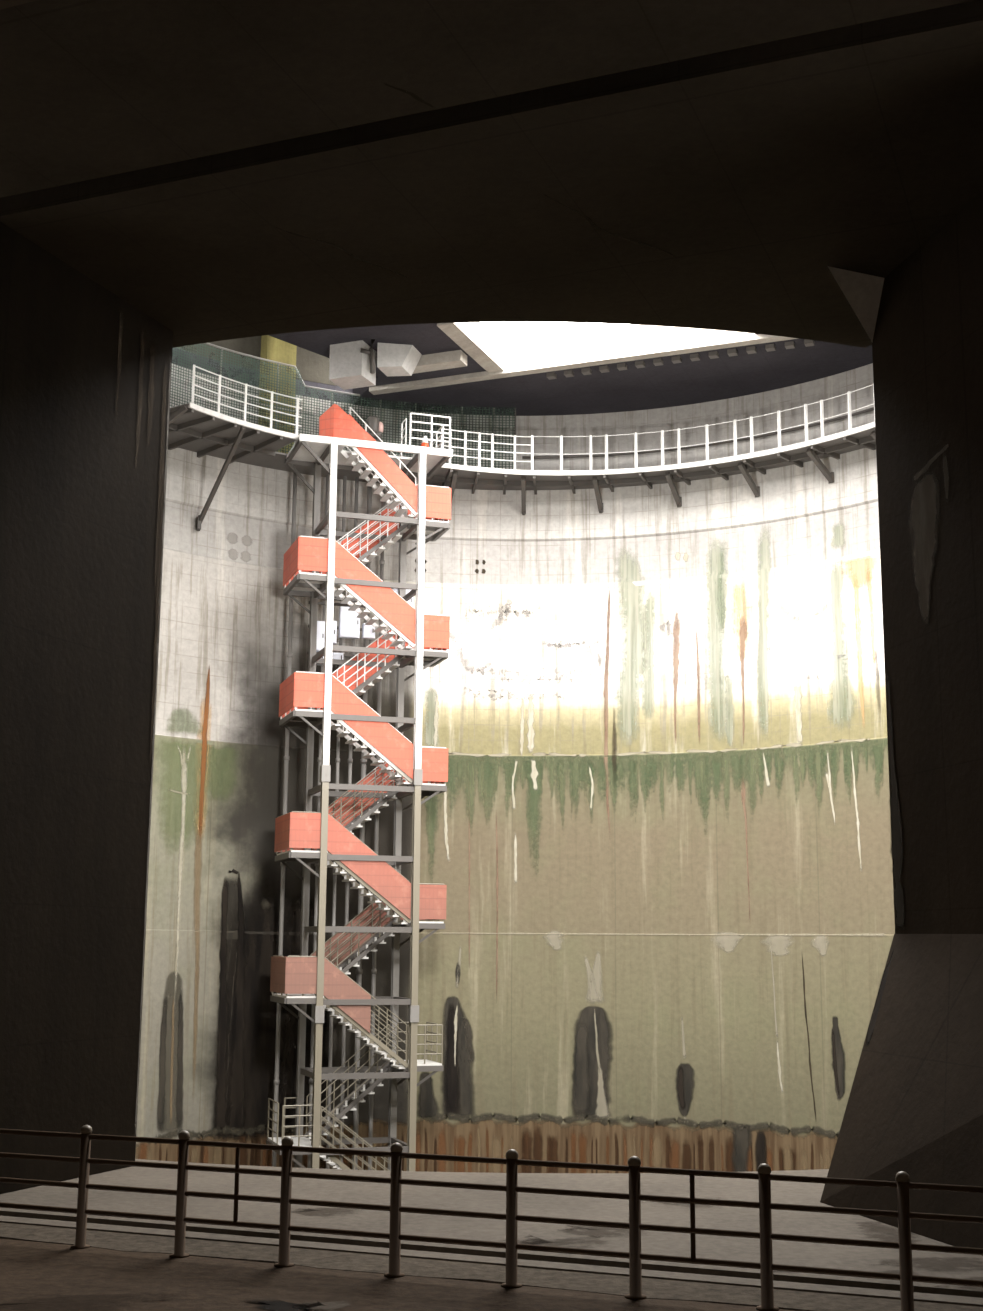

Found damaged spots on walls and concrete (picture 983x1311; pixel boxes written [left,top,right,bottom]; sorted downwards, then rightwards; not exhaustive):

rust [193,667,210,1068]
water stain [156,750,330,1139]
water stain [434,695,594,808]
water stain [418,931,883,1172]
water stain [755,687,869,868]